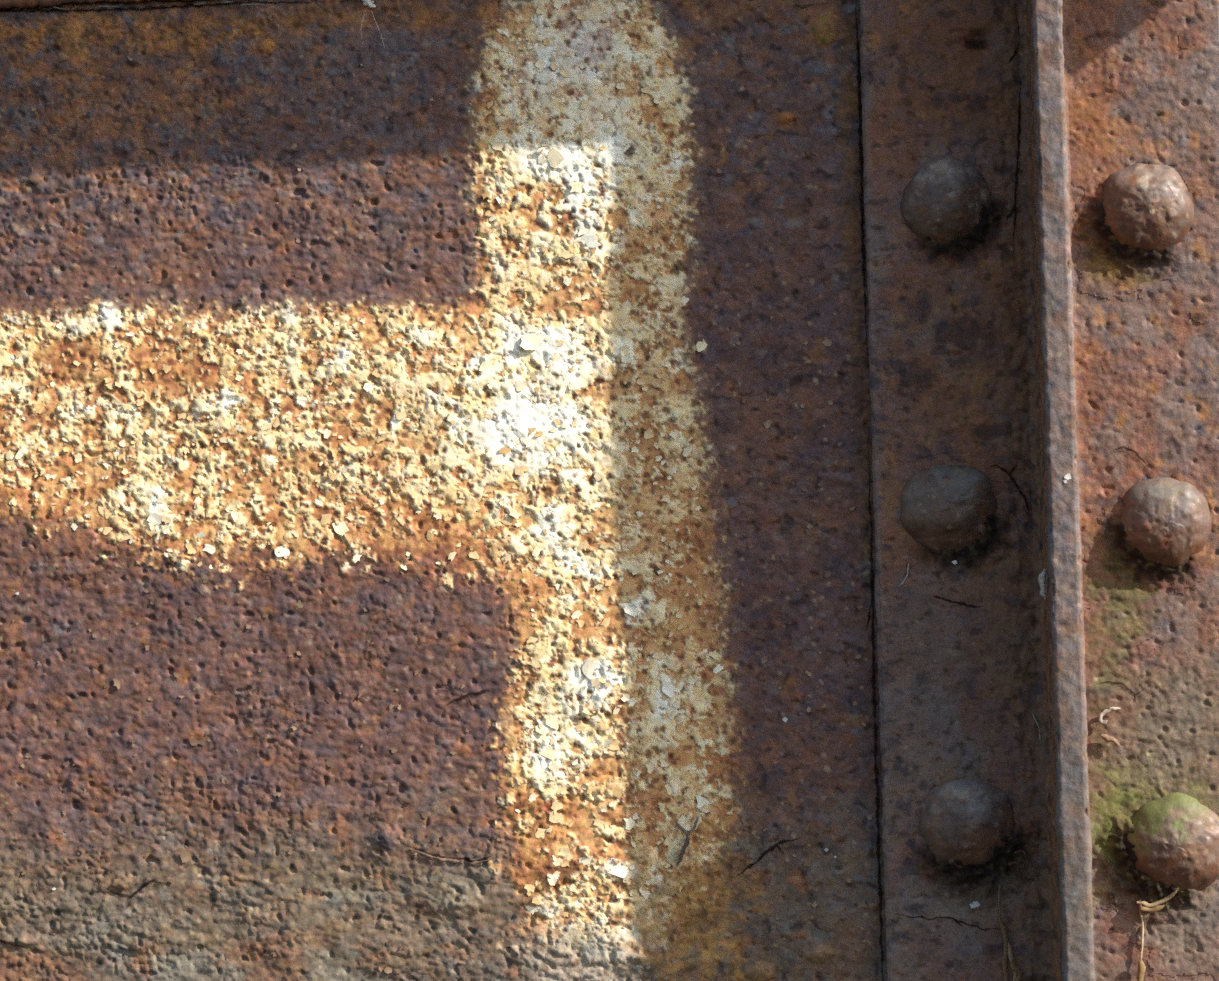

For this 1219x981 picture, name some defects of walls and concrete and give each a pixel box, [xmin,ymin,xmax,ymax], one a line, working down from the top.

rust [0,0,512,179]
rust [1069,74,1186,190]
rust [0,480,153,605]
peeling [0,387,303,572]
peeling [214,397,367,540]
rust [327,504,546,630]
peeling [397,317,584,577]
peeling [565,326,702,639]
rust [593,279,887,981]
peeling [519,636,723,841]
rust [485,791,561,924]
peeling [524,787,673,917]